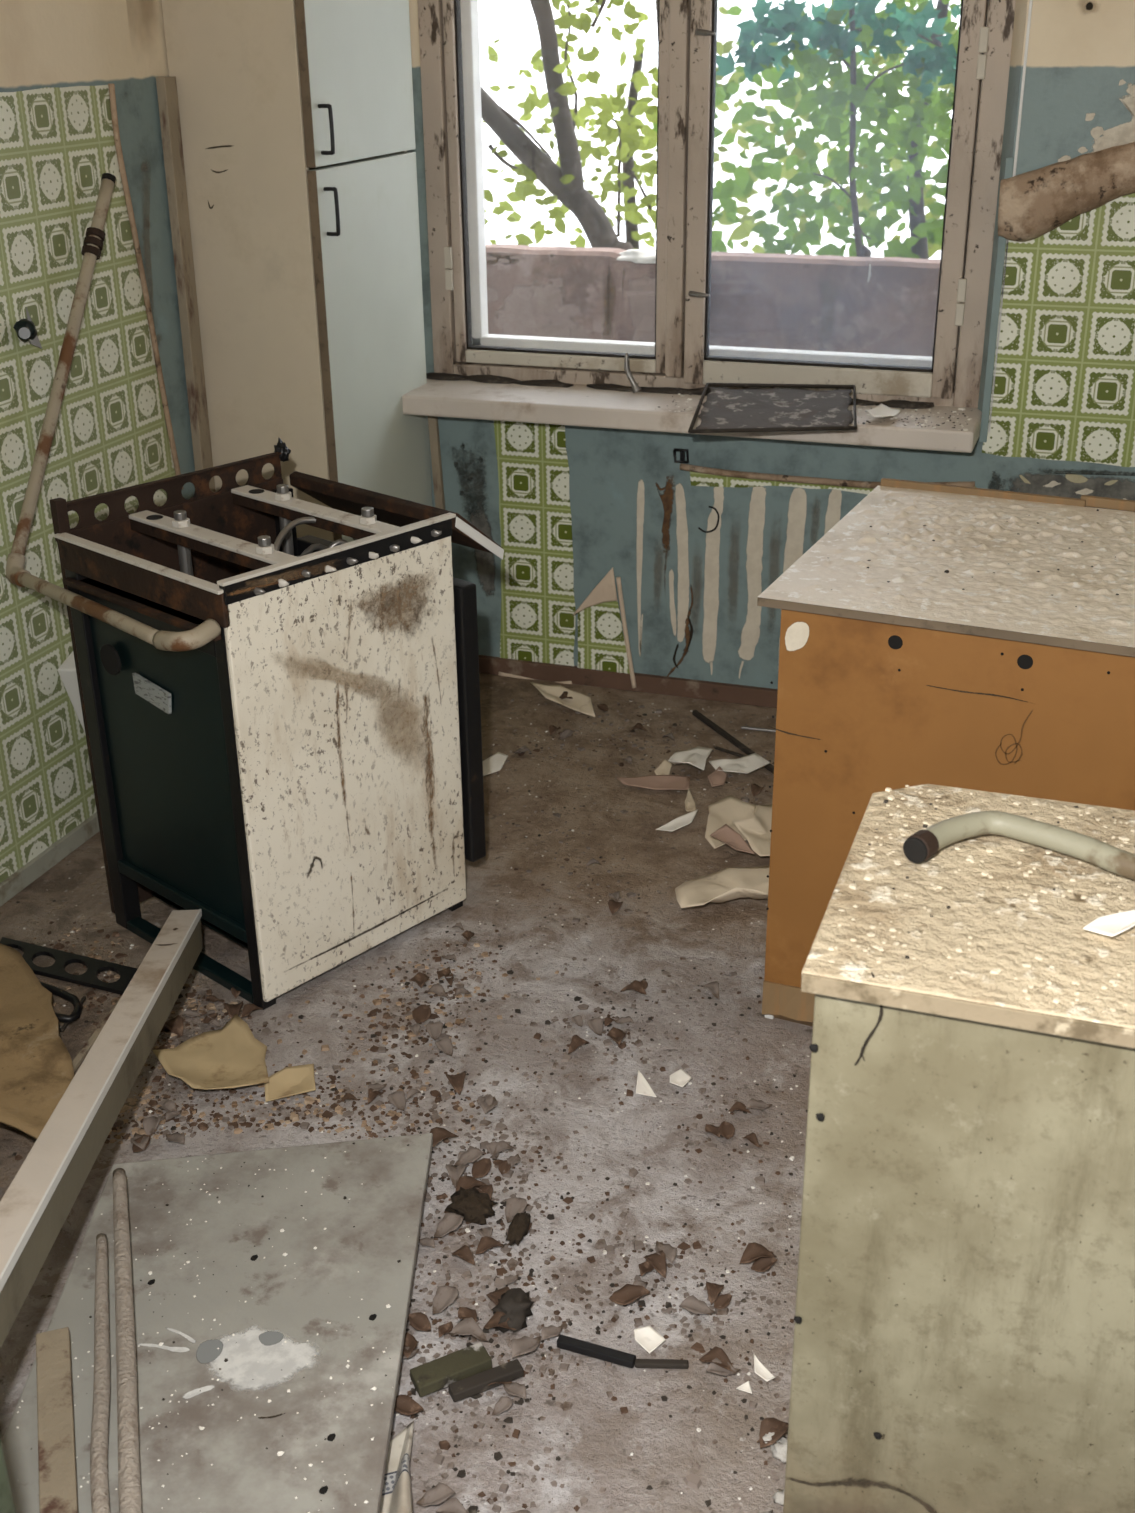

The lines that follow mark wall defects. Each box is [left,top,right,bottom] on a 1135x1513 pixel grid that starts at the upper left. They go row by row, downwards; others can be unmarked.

peeling [1058,79,1135,162]
peeling [636,480,644,655]
peeling [669,483,724,675]
peeling [738,486,766,679]
peeling [783,488,807,573]
peeling [824,489,842,535]